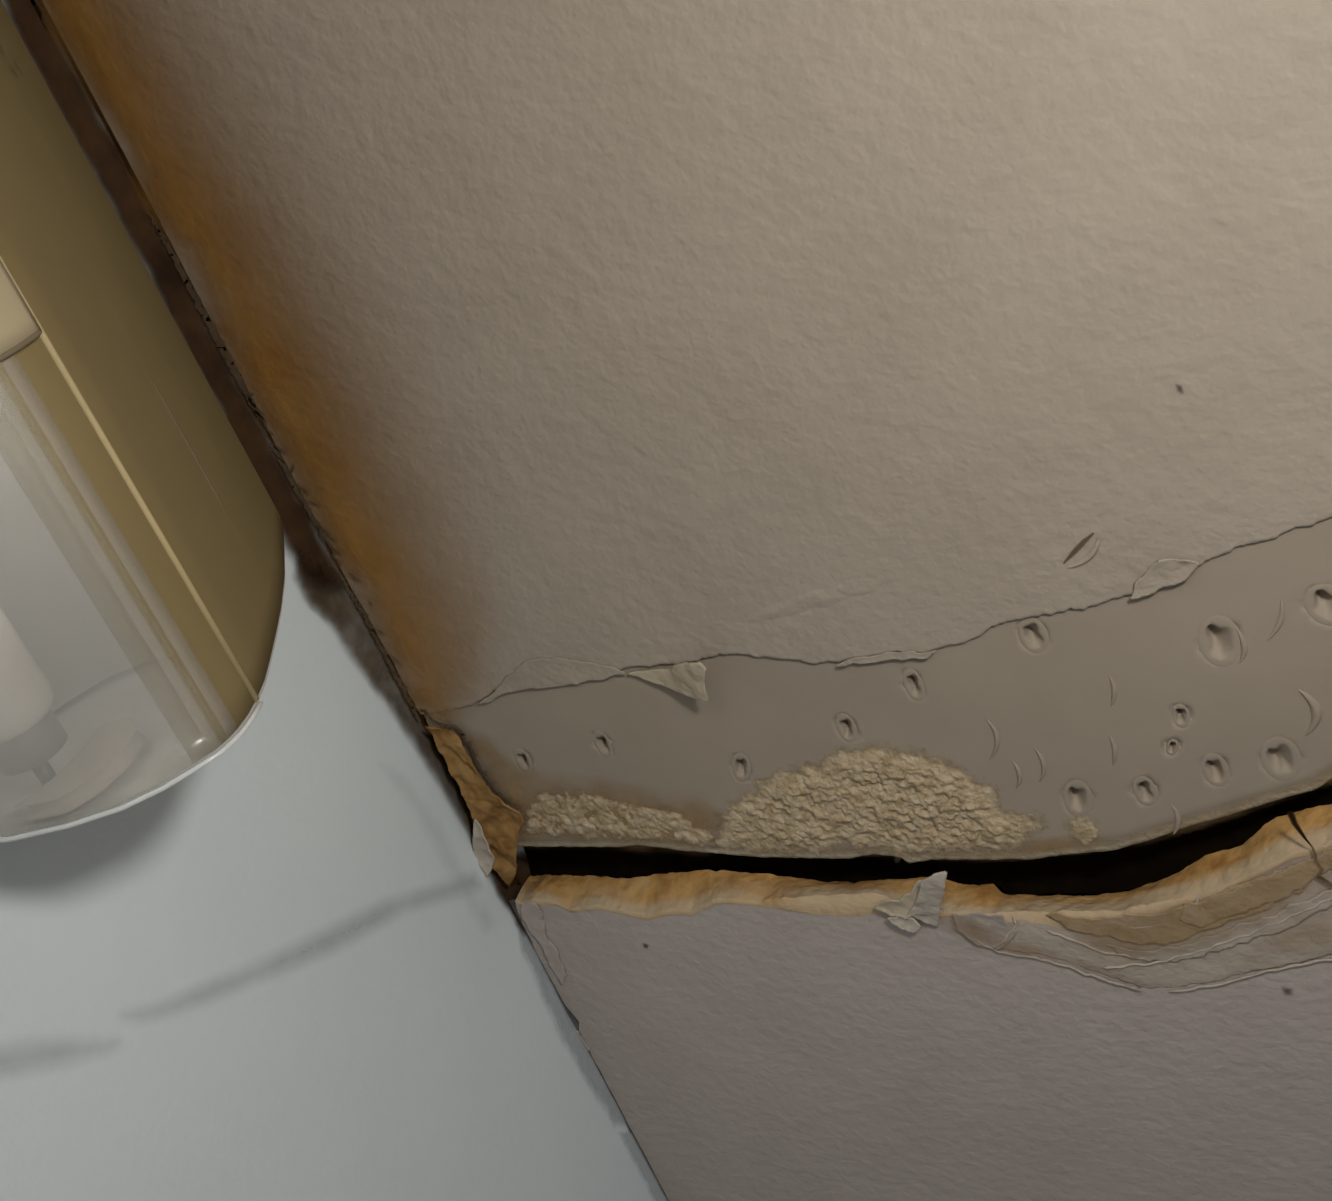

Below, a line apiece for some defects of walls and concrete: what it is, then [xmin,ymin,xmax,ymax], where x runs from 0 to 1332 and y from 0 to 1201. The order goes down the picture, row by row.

water stain [2,0,474,835]
crack [30,0,521,815]
water stain [490,854,537,932]
peeling [425,517,1332,992]
crack [509,779,1332,1201]